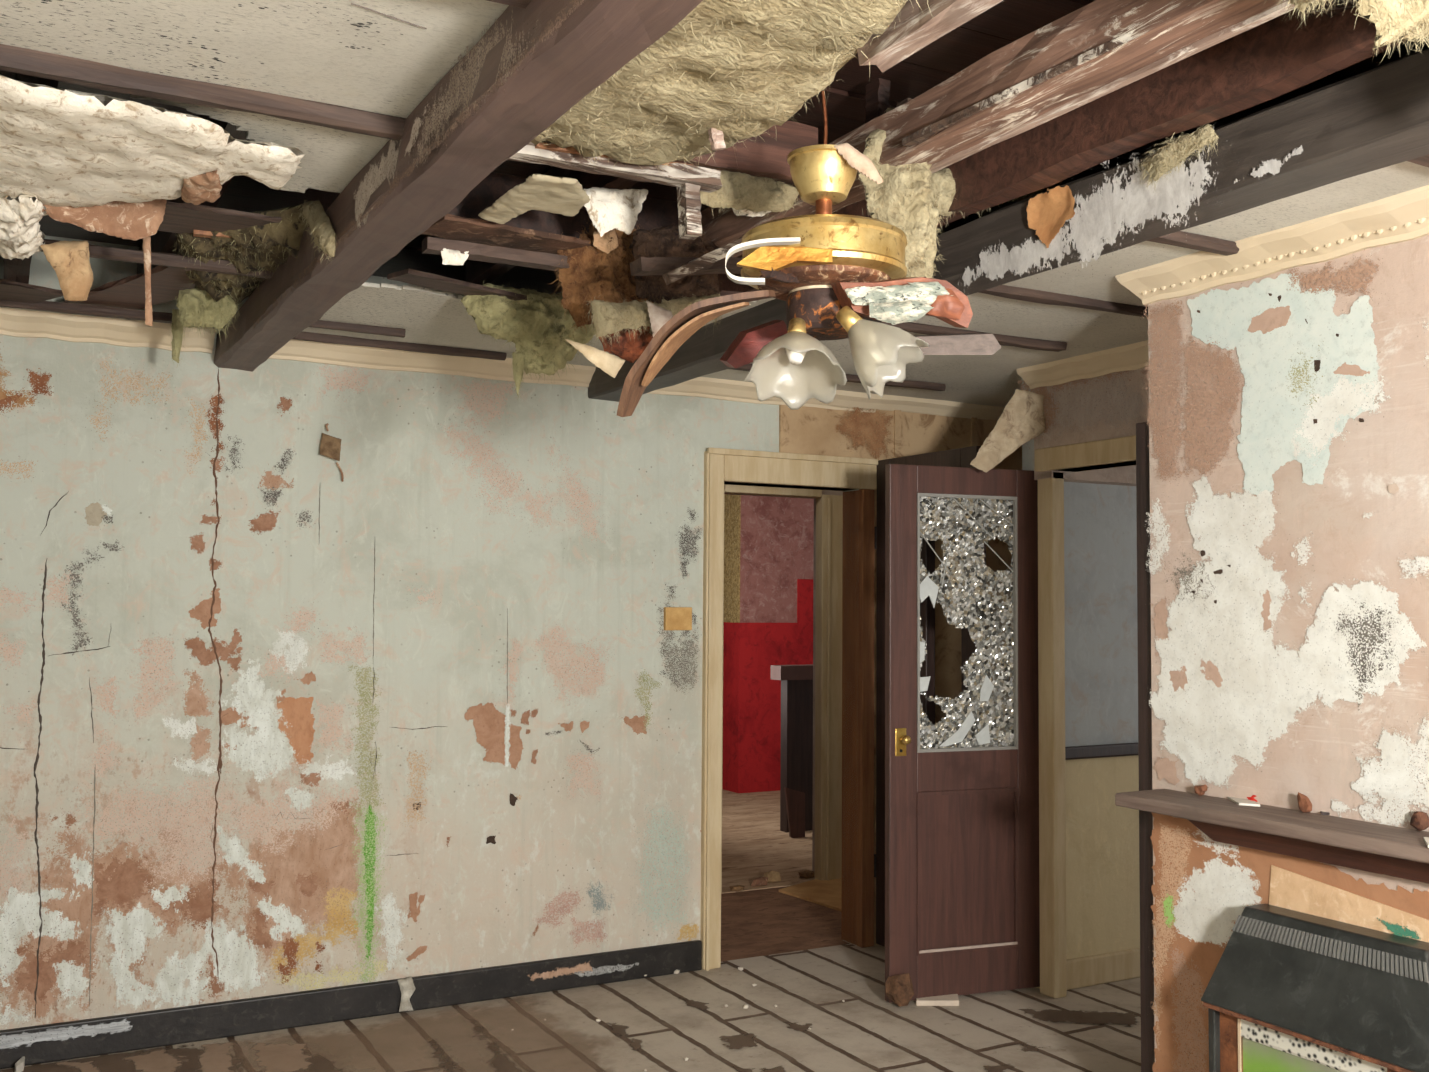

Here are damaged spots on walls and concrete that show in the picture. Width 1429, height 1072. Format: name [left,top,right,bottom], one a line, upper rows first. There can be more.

peeling [1026,185,1075,248]
spalling [189,532,222,570]
peeling [1145,273,1429,790]
crack [208,368,228,979]
crack [0,491,111,1017]
spalling [0,588,363,1030]
spalling [404,750,432,828]
spalling [464,702,597,769]
peeling [1331,713,1429,827]
spalling [373,891,427,971]
spalling [1150,812,1429,1072]